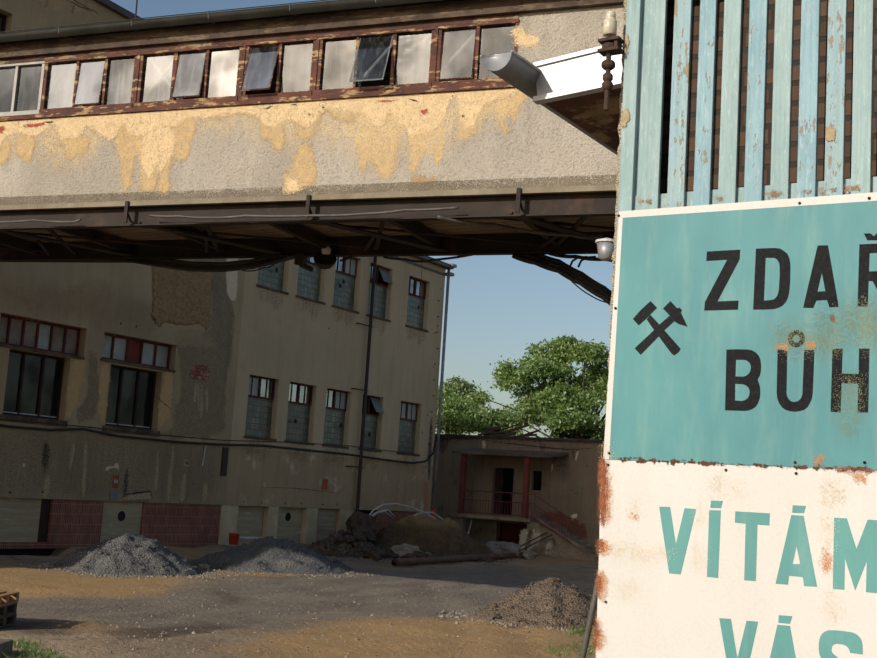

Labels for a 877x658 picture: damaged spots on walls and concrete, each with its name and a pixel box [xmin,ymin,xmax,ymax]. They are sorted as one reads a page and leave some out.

peeling [0,88,528,197]
peeling [825,127,836,141]
flaking render [151,259,213,332]